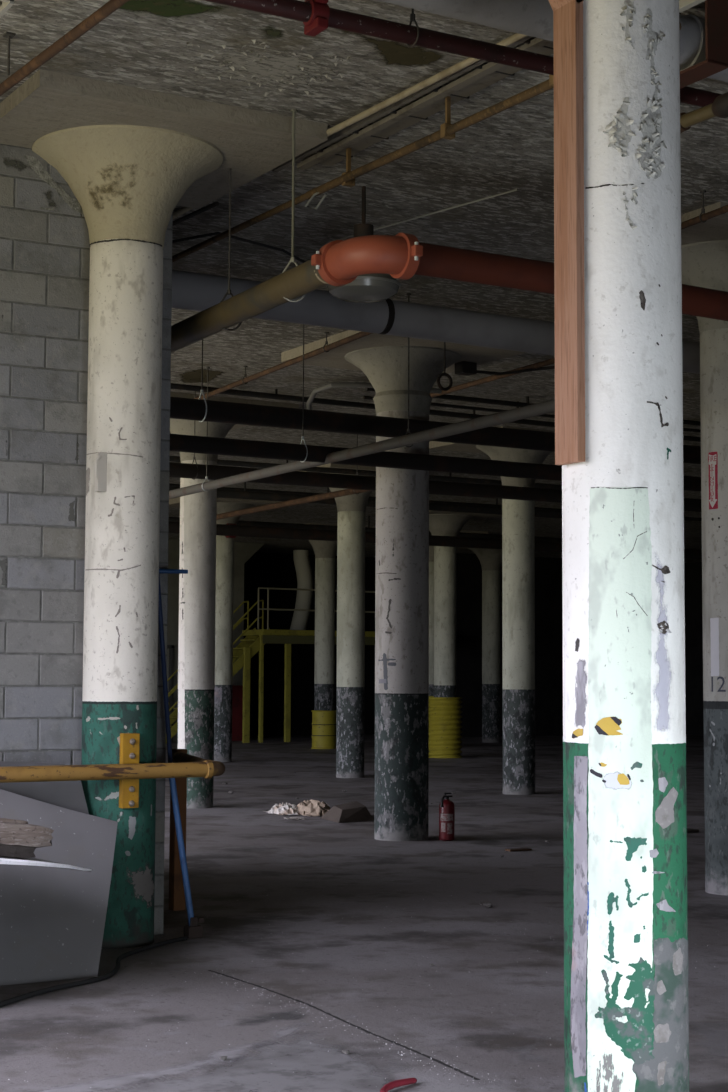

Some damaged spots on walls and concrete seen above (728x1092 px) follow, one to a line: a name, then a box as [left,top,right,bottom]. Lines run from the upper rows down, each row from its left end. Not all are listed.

peeling [603,0,667,179]
leakage [90,169,134,209]
peeling [623,187,638,230]
peeling [117,812,136,856]
peeling [570,756,689,1092]